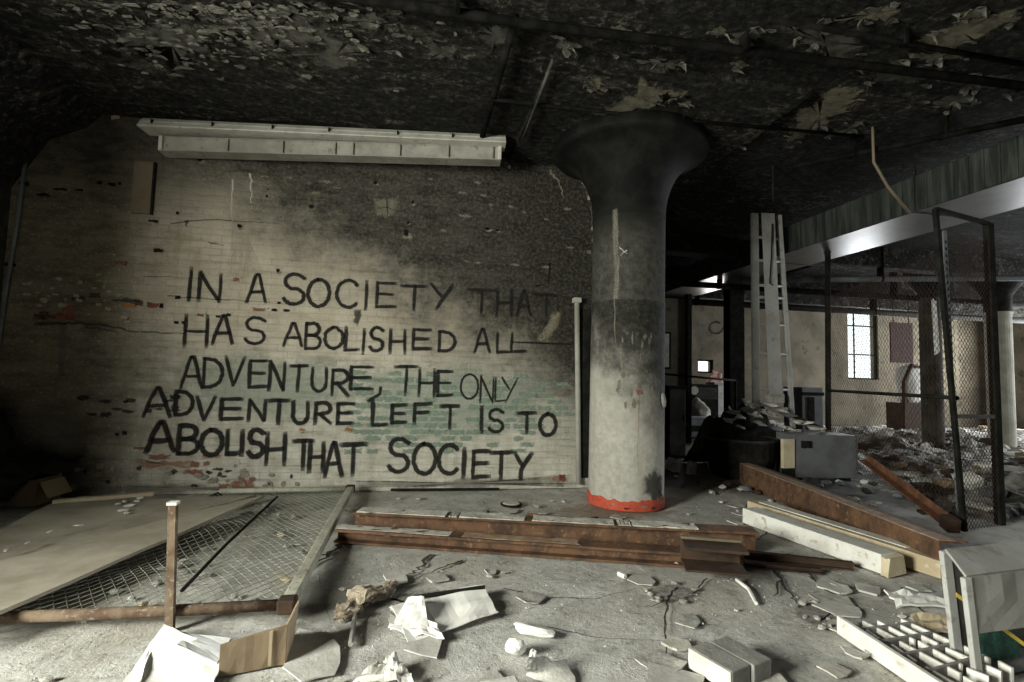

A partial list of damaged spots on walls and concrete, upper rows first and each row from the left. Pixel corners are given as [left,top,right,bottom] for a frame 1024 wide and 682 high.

peeling [54,0,459,81]
peeling [479,25,517,54]
peeling [551,35,582,58]
peeling [583,76,608,93]
peeling [596,25,694,116]
peeling [706,2,1021,150]
crack [34,321,183,334]
peeling [70,447,300,491]